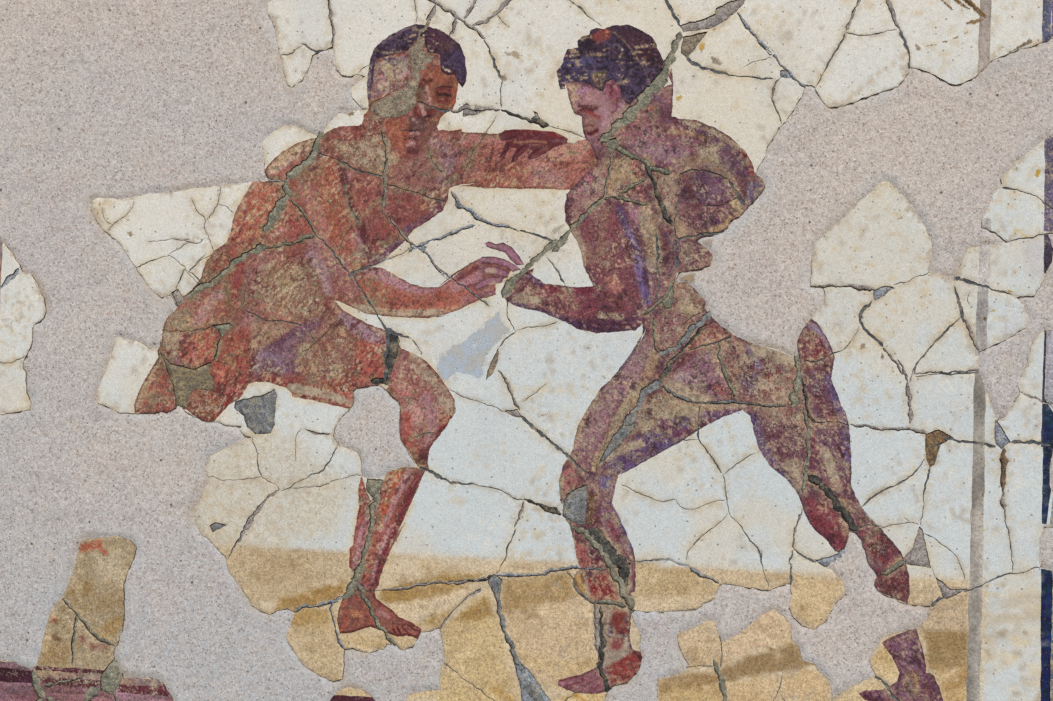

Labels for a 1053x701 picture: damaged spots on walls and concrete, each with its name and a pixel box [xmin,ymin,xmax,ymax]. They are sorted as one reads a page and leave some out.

spalling [144,130,356,306]
crack [136,0,910,380]
crack [1003,187,1053,243]
spalling [873,282,900,301]
spalling [122,323,232,411]
spalling [234,389,277,457]
crack [210,440,362,557]
crack [295,233,1053,701]
spalling [989,420,1010,449]
spalling [815,548,846,592]
spalling [876,527,967,599]
spalling [466,574,551,701]